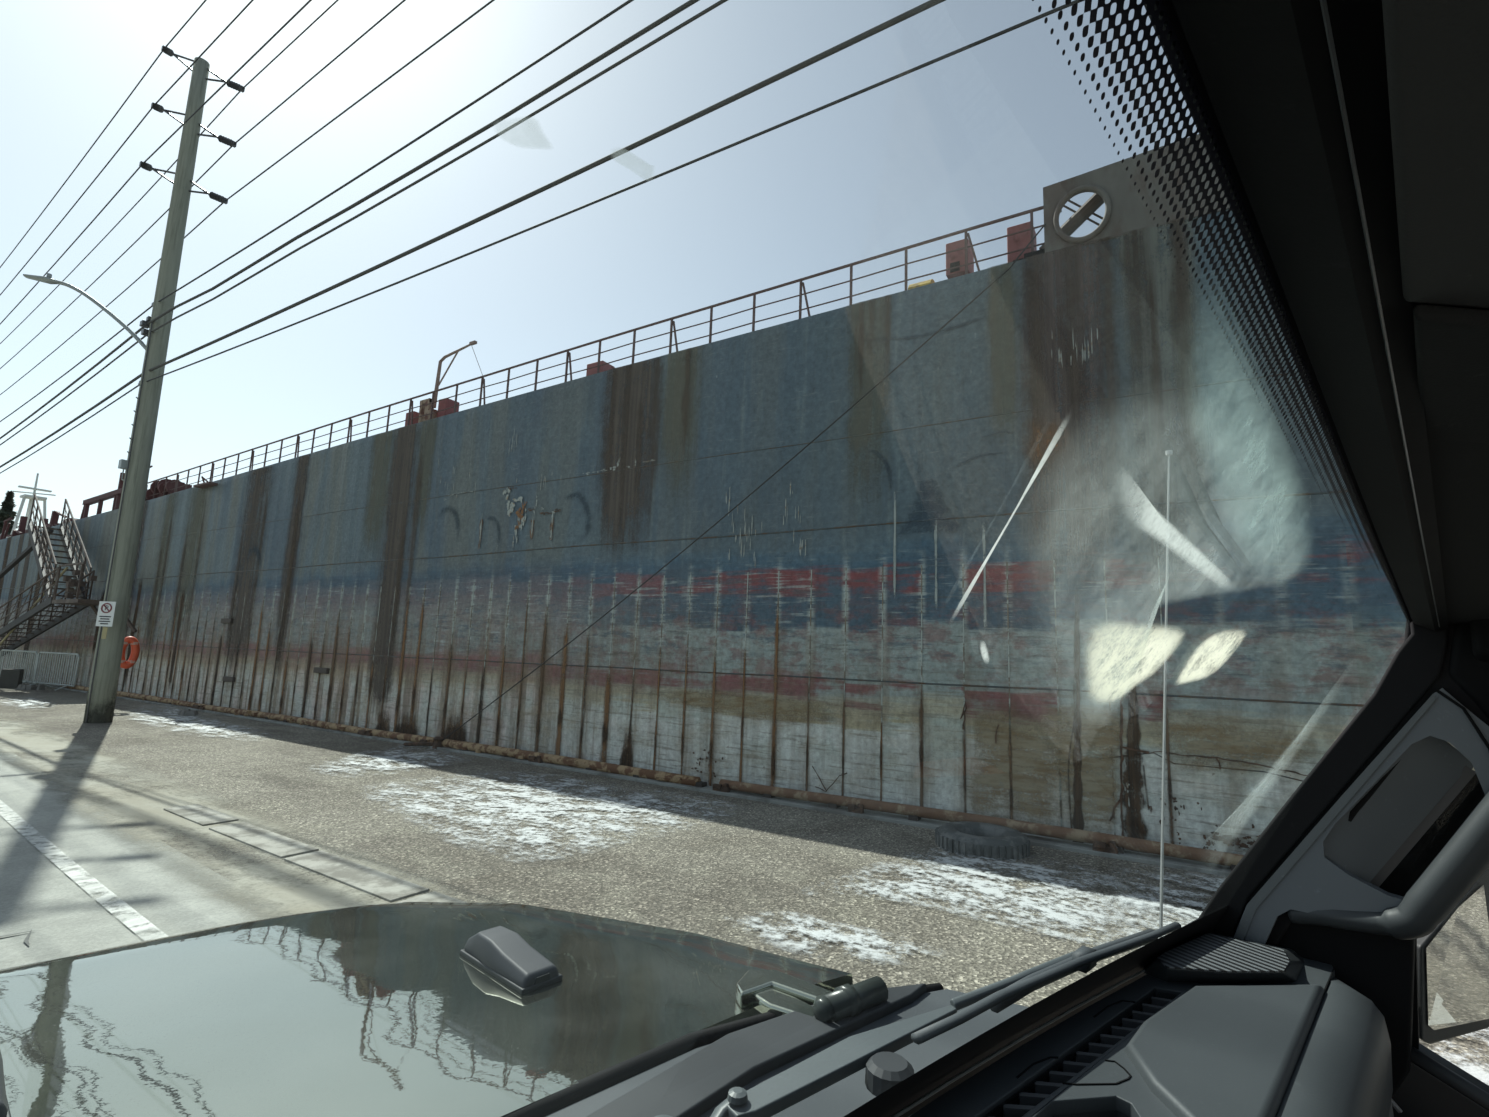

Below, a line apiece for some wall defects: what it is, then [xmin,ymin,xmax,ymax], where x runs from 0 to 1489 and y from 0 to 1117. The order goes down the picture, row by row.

corrosion [121,424,589,759]
peeling [503,487,561,547]
corrosion [601,346,697,546]
corrosion [849,295,890,472]
corrosion [1022,218,1206,597]
corrosion [601,677,633,767]
corrosion [653,615,845,796]